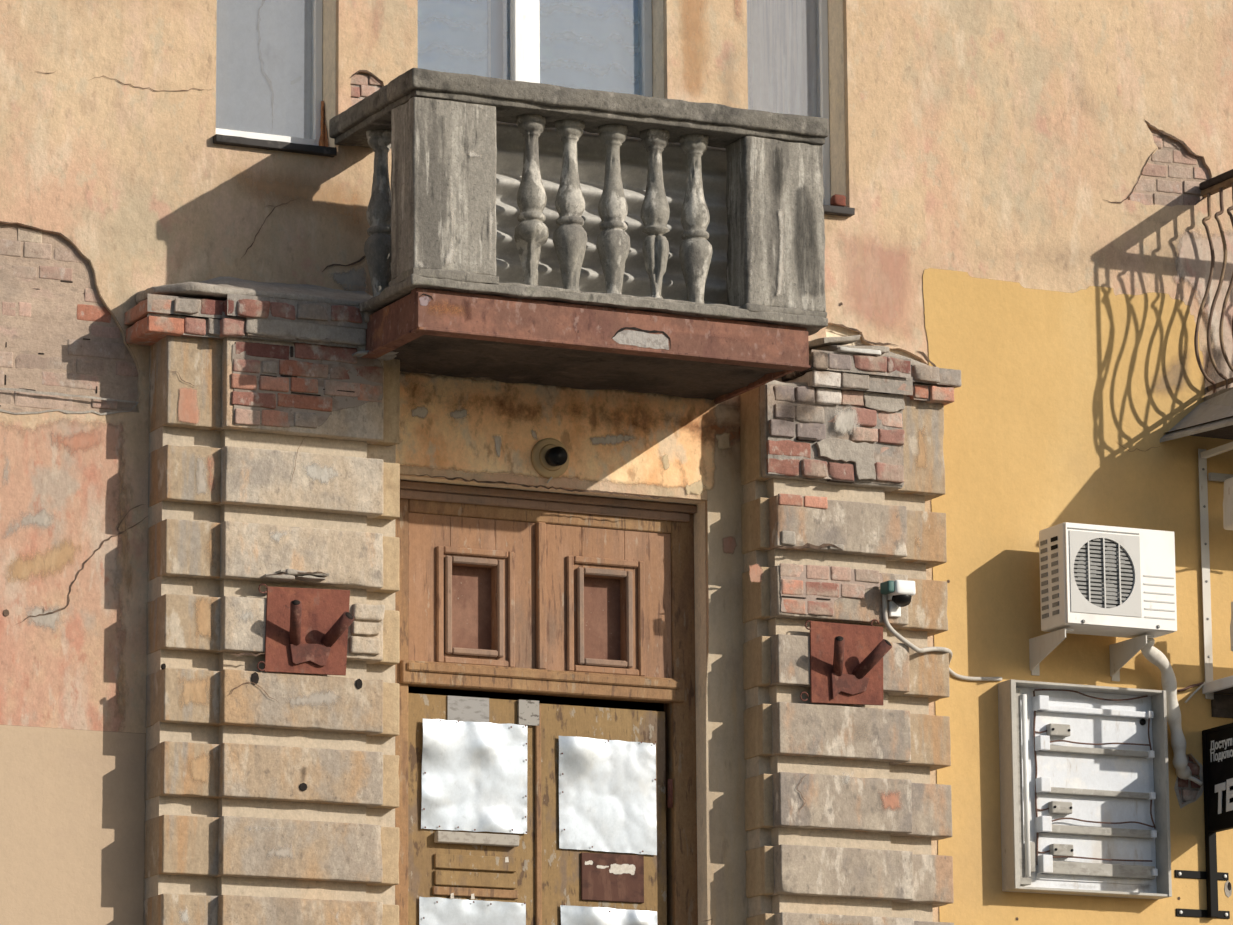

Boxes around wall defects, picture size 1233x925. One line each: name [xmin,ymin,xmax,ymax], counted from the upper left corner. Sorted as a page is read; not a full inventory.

crack [95,75,211,91]
spalling [350,70,383,106]
spalling [1106,120,1210,207]
spalling [231,342,384,428]
peeling [0,221,140,732]
spalling [759,380,926,509]
crack [20,505,148,623]